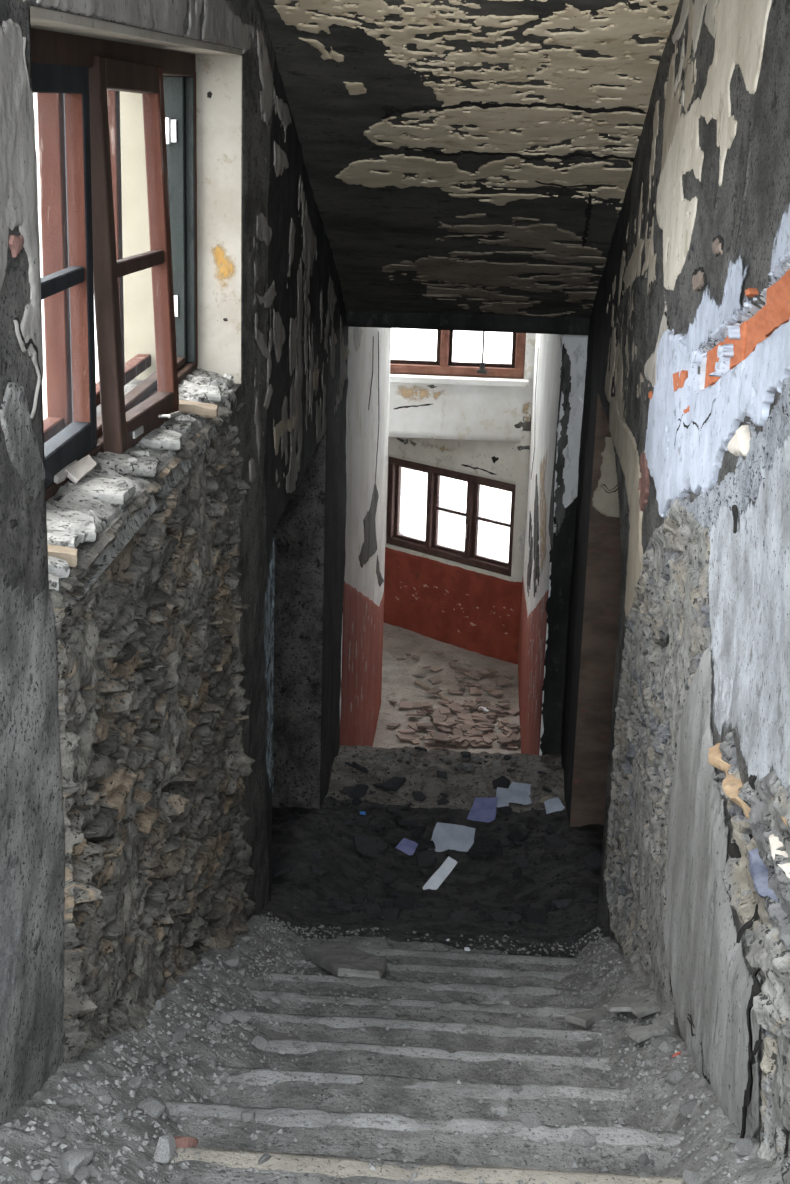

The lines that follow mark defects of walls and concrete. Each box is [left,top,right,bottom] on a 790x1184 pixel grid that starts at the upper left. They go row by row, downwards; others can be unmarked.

peeling [0,19,43,380]
peeling [23,0,292,177]
spalling [51,175,363,1064]
spalling [274,0,790,1184]
crack [740,967,763,1138]